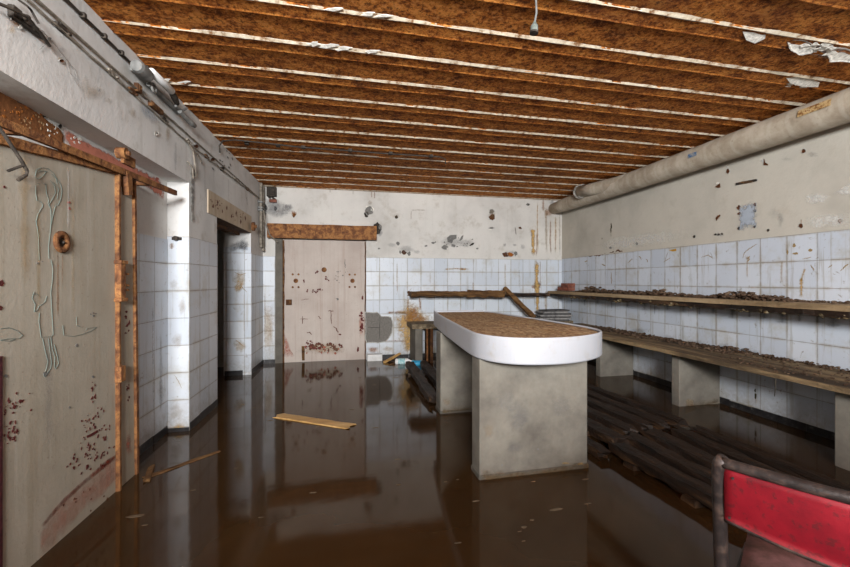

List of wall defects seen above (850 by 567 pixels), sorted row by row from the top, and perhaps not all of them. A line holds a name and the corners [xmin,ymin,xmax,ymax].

peeling [743,32,766,43]
peeling [787,40,850,63]
rust [0,92,117,174]
peeling [425,235,478,250]
spalling [365,312,393,343]
rust [305,340,343,355]